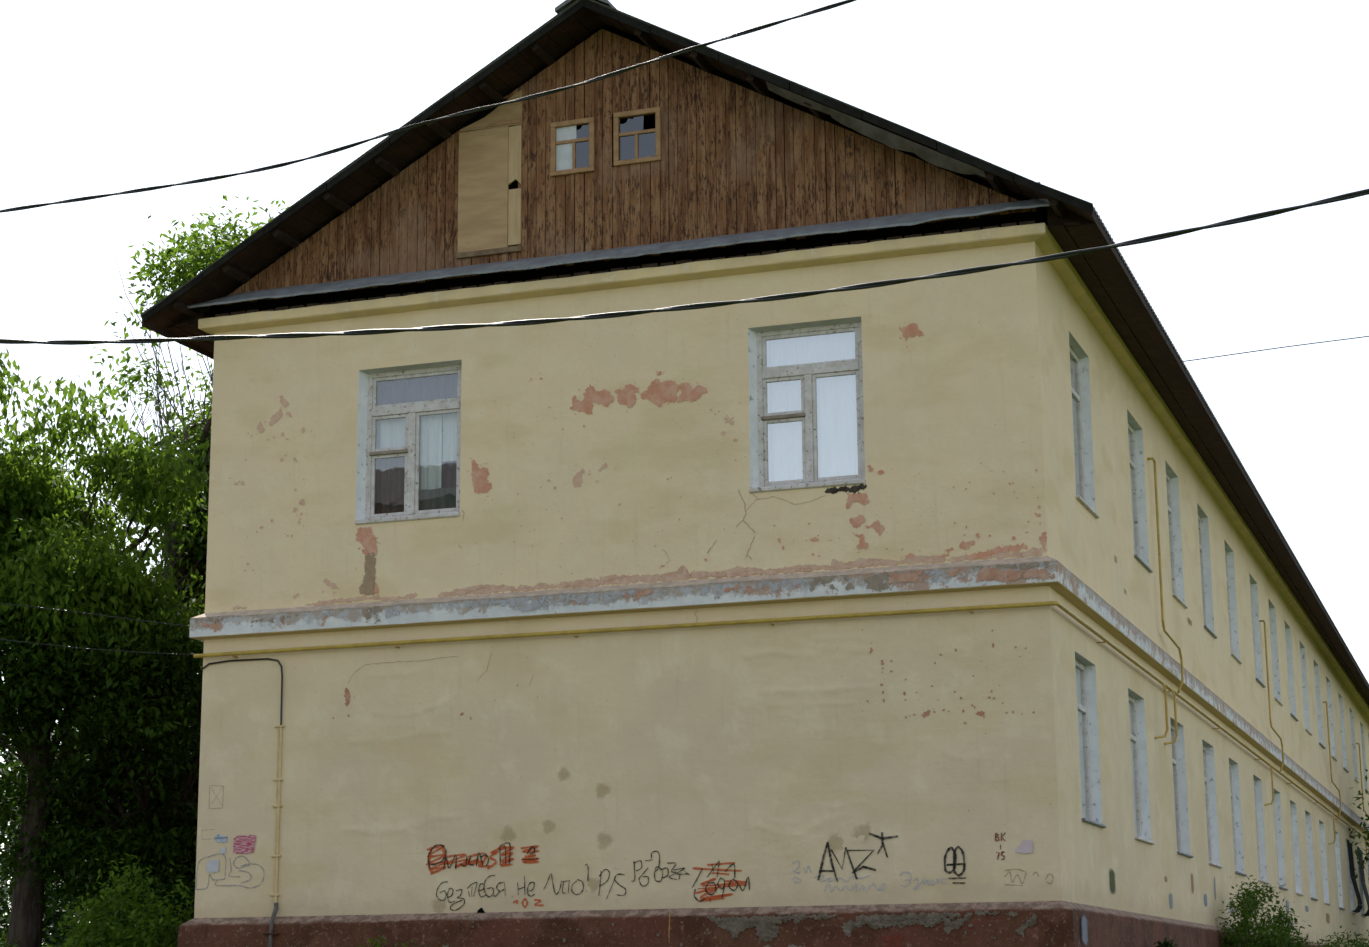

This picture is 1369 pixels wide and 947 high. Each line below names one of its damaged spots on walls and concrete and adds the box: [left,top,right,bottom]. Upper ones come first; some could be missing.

peeling [899,323,924,347]
peeling [549,371,740,450]
peeling [468,458,492,500]
peeling [356,527,378,555]
peeling [438,465,1055,612]
crack [707,489,825,559]
spalling [707,909,1037,947]